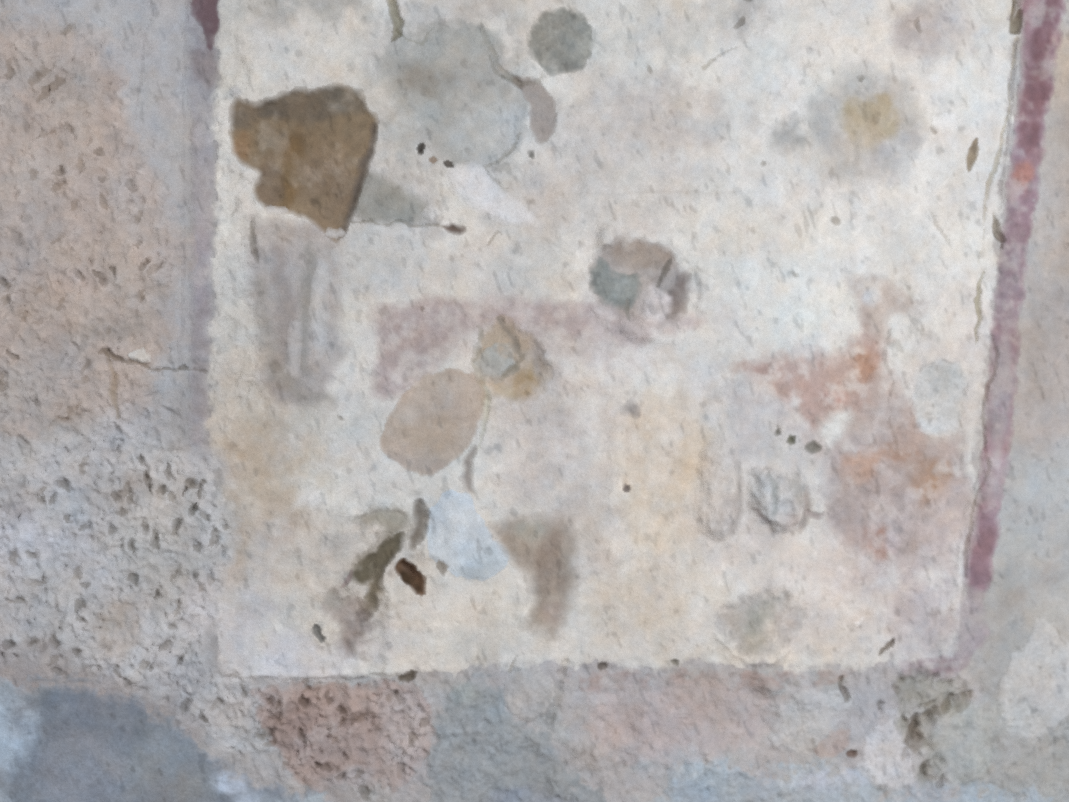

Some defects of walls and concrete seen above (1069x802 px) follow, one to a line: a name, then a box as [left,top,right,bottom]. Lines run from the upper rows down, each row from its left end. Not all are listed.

crack [386,0,433,46]
peeling [429,156,454,168]
crack [931,212,953,249]
crack [963,0,1023,578]
flaking render [0,7,437,801]